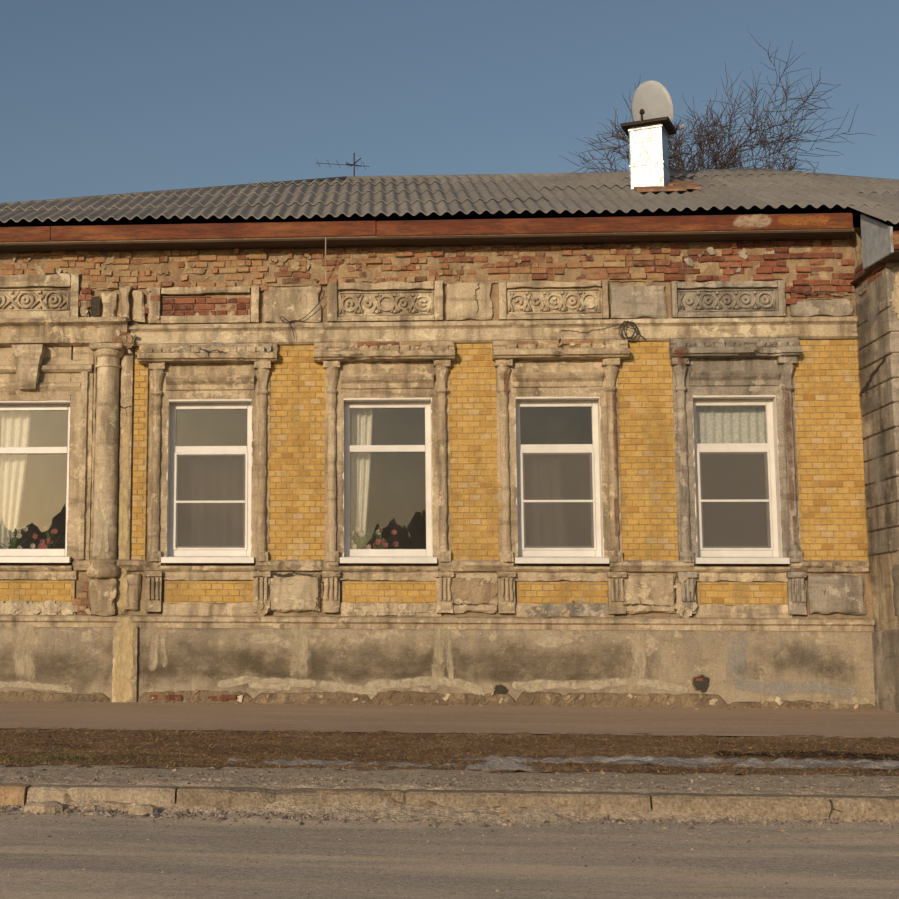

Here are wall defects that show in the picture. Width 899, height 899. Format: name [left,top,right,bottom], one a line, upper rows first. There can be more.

peeling [734,215,830,227]
flaking render [0,239,885,319]
flaking render [890,272,899,319]
crack [859,354,887,398]